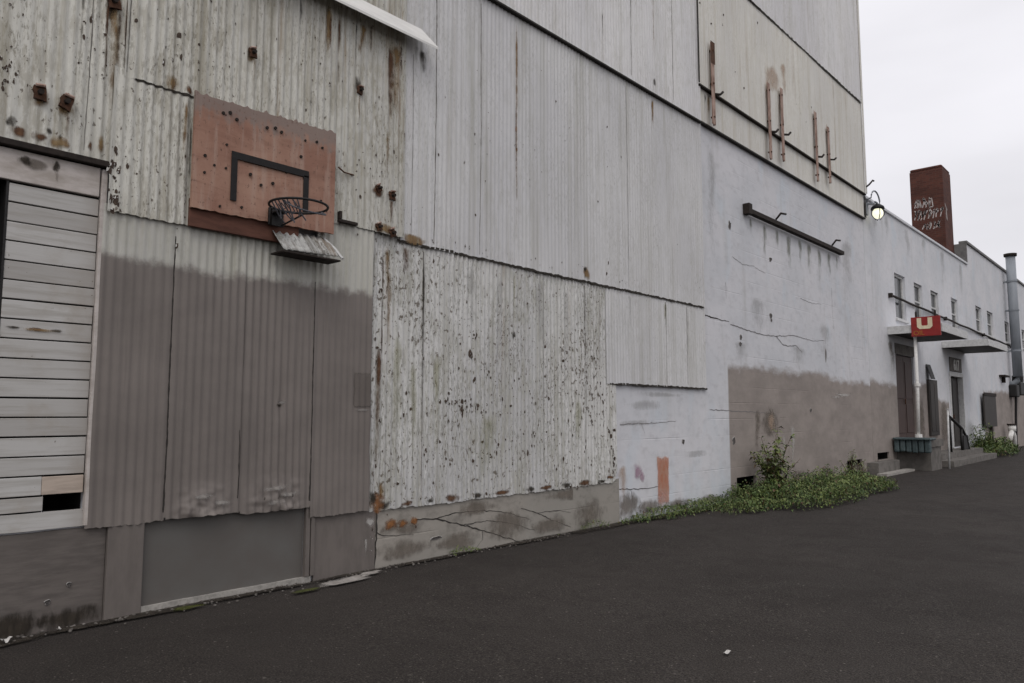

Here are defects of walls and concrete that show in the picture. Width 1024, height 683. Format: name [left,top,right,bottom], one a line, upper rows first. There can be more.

rust [389,47,402,103]
rust [404,234,422,268]
crack [705,298,834,352]
rust [530,476,613,491]
rust [371,484,417,533]
crack [374,508,570,567]
damp [0,606,95,640]